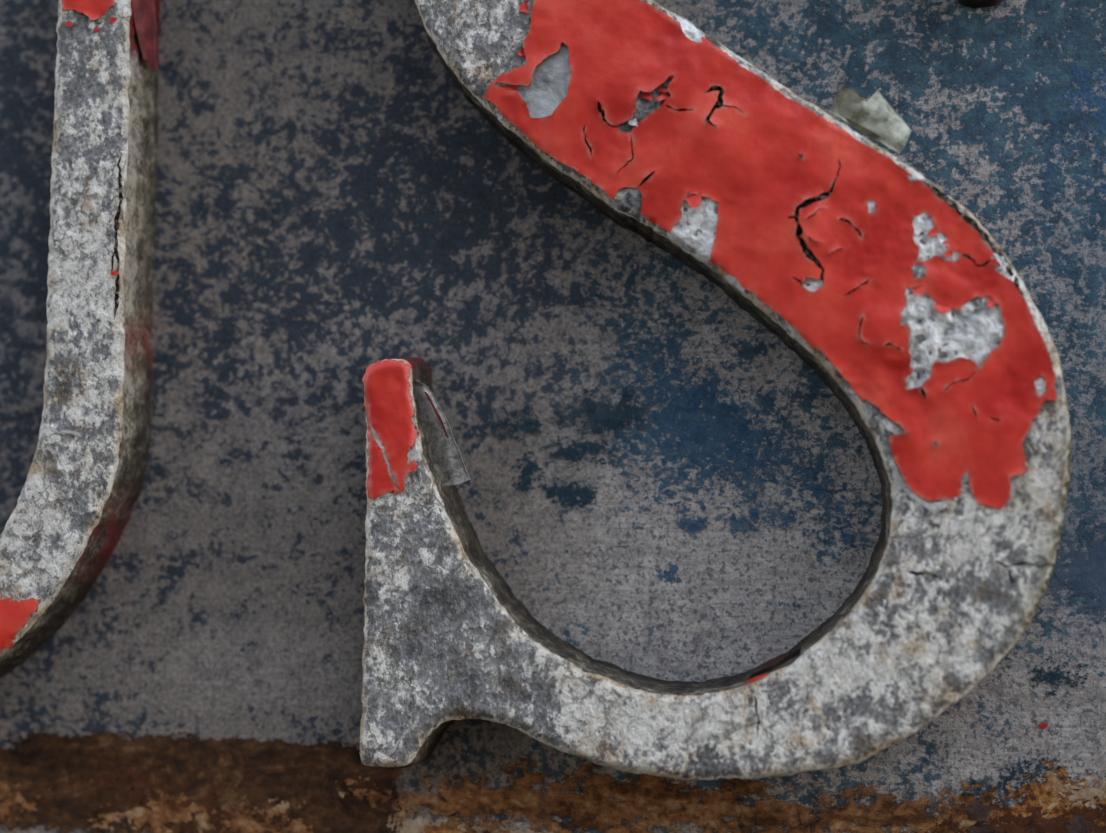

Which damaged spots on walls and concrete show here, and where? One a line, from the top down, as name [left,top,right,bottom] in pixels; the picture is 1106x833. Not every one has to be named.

peeling [419,0,571,118]
crack [583,102,655,187]
peeling [677,17,705,43]
crack [667,86,741,126]
peeling [830,85,912,154]
crack [111,152,123,319]
peeling [667,192,718,267]
crack [789,160,869,295]
crack [859,317,901,350]
peeling [901,213,1005,390]
peeling [484,315,881,564]
corrosion [0,725,1106,833]